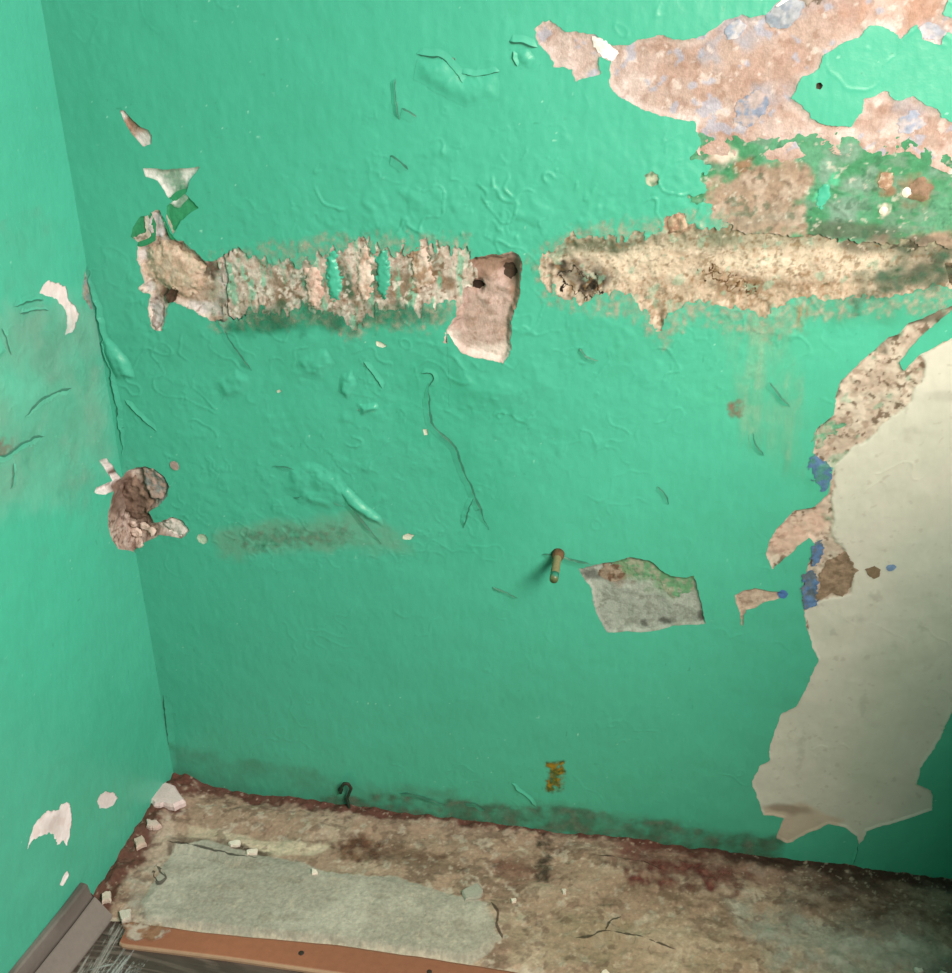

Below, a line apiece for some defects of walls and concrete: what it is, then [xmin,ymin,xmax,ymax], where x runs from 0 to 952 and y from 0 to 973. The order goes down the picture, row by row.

peeling [120,110,152,147]
flaking render [131,167,522,364]
flaking render [534,0,952,844]
flaking render [95,458,208,553]
corrosion [546,761,566,792]
peeling [27,802,72,849]
spalling [93,773,952,973]
damp [536,809,589,882]